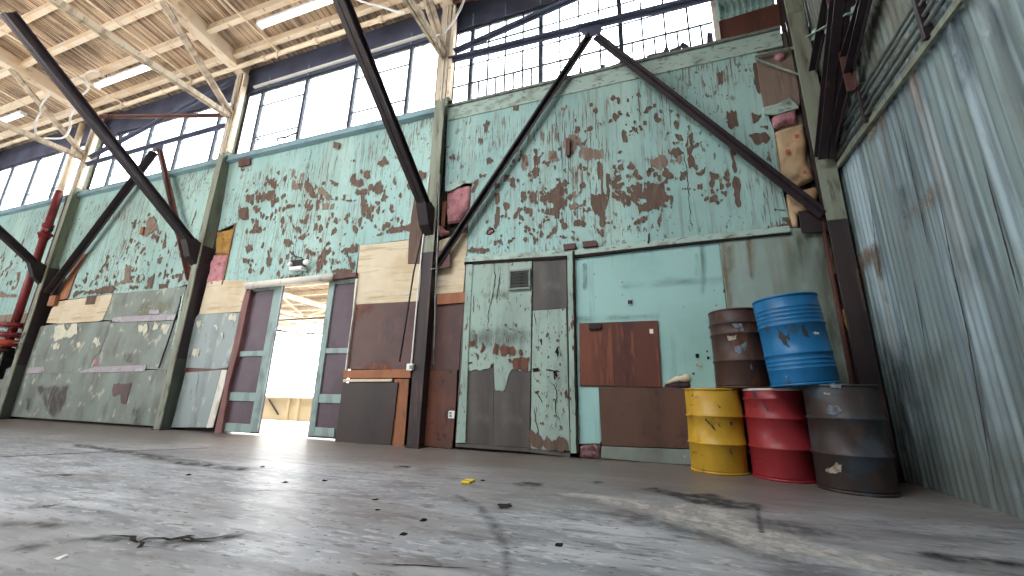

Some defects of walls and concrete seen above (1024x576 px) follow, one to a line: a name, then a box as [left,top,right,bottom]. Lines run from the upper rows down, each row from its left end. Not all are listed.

peeling [717,70,739,129]
peeling [753,50,765,94]
peeling [749,112,771,145]
peeling [468,92,741,254]
peeling [238,156,410,279]
peeling [0,239,27,298]
peeling [73,210,184,298]
peeling [51,323,100,350]
peeling [138,309,170,335]
peeling [196,314,236,339]
peeling [112,383,131,405]
peeling [468,321,569,453]